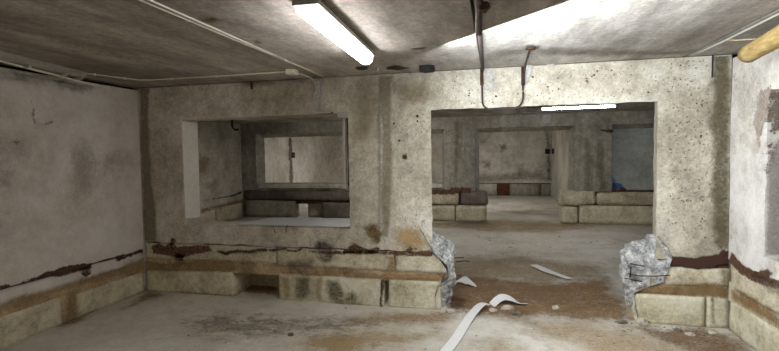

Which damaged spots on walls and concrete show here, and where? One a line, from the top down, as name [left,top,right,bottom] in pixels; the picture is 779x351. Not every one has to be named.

damp [289,241,355,302]
spalling [392,211,469,308]
spalling [619,234,728,316]
rust [731,290,779,326]